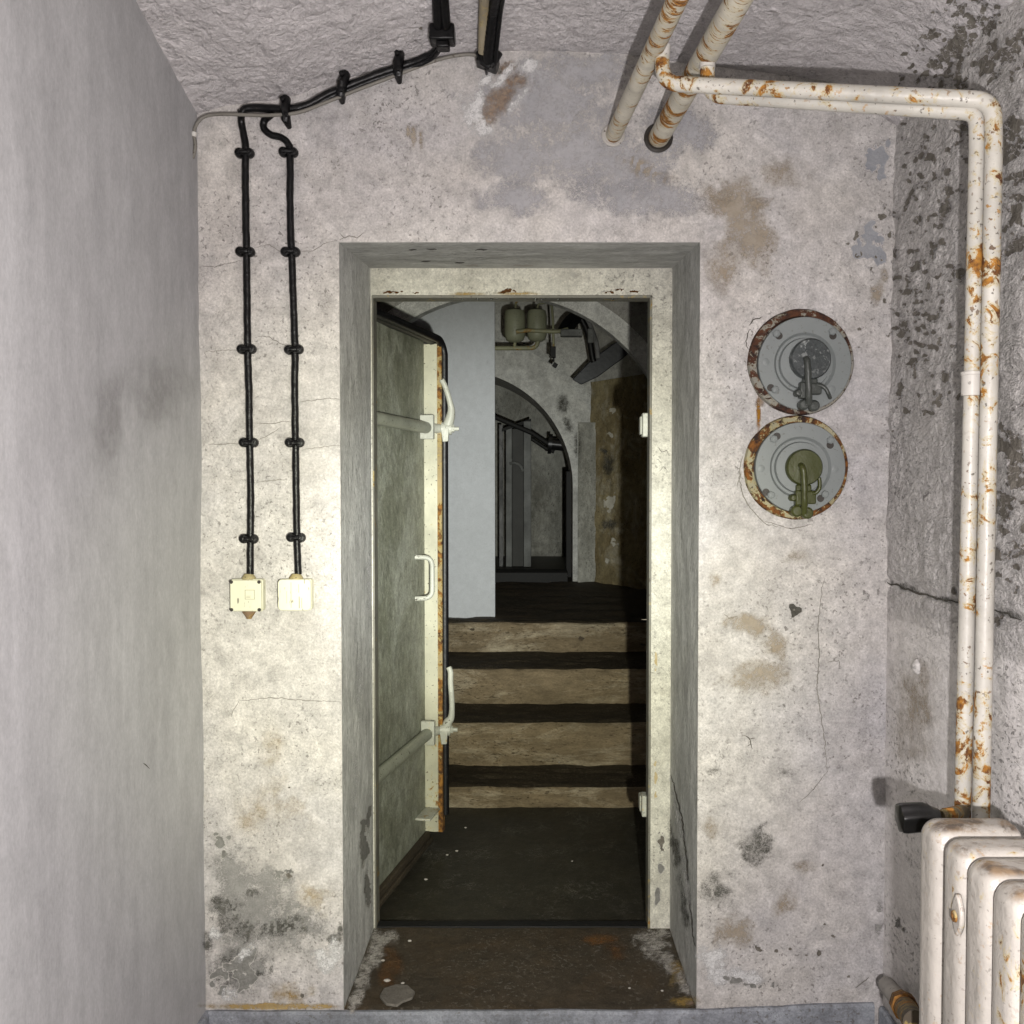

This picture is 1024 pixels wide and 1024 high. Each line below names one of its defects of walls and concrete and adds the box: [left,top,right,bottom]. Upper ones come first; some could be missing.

water stain [463,52,774,281]
peeling [846,120,969,416]
water stain [724,614,787,687]
crack [800,580,840,802]
crack [887,582,959,603]
spalling [209,945,259,1001]
water stain [203,847,345,1010]
crack [670,775,695,945]
water stain [702,875,731,897]
water stain [741,826,772,865]